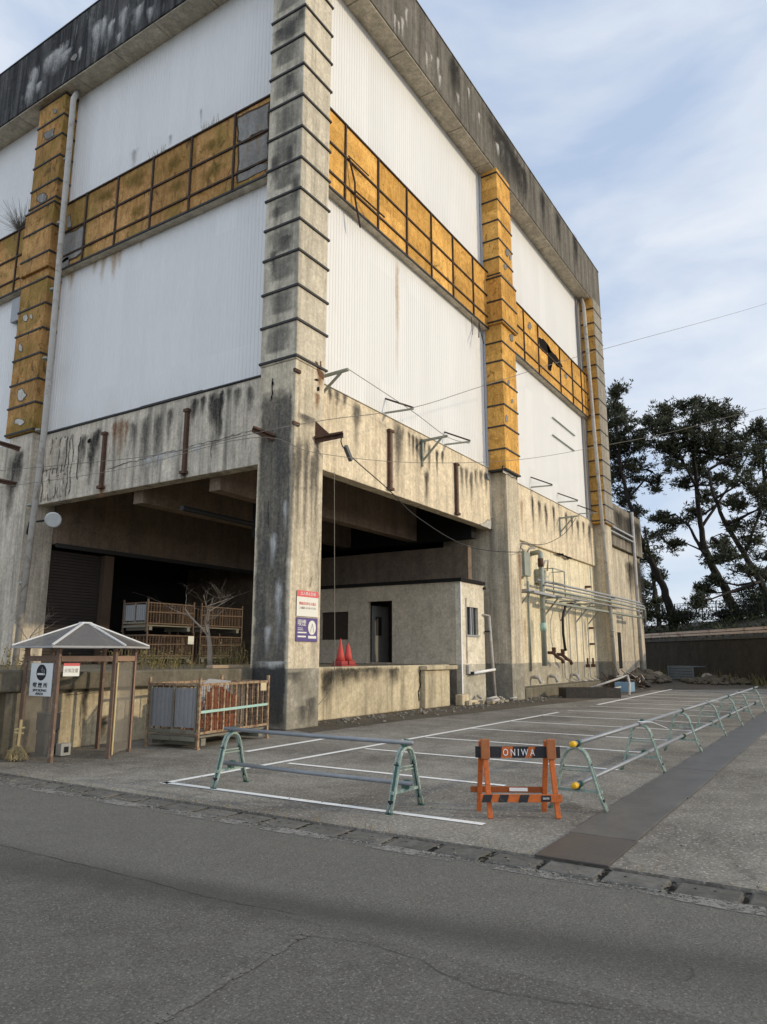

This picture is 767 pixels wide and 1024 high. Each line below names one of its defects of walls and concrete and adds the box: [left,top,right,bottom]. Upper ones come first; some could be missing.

damp [93,5,152,40]
damp [27,46,81,96]
damp [426,53,469,97]
damp [478,114,527,193]
spalling [528,322,567,378]
damp [329,388,360,426]
damp [81,430,101,474]
damp [132,410,175,462]
damp [396,426,444,489]
damp [532,498,590,540]
damp [192,388,319,723]
damp [301,667,399,716]